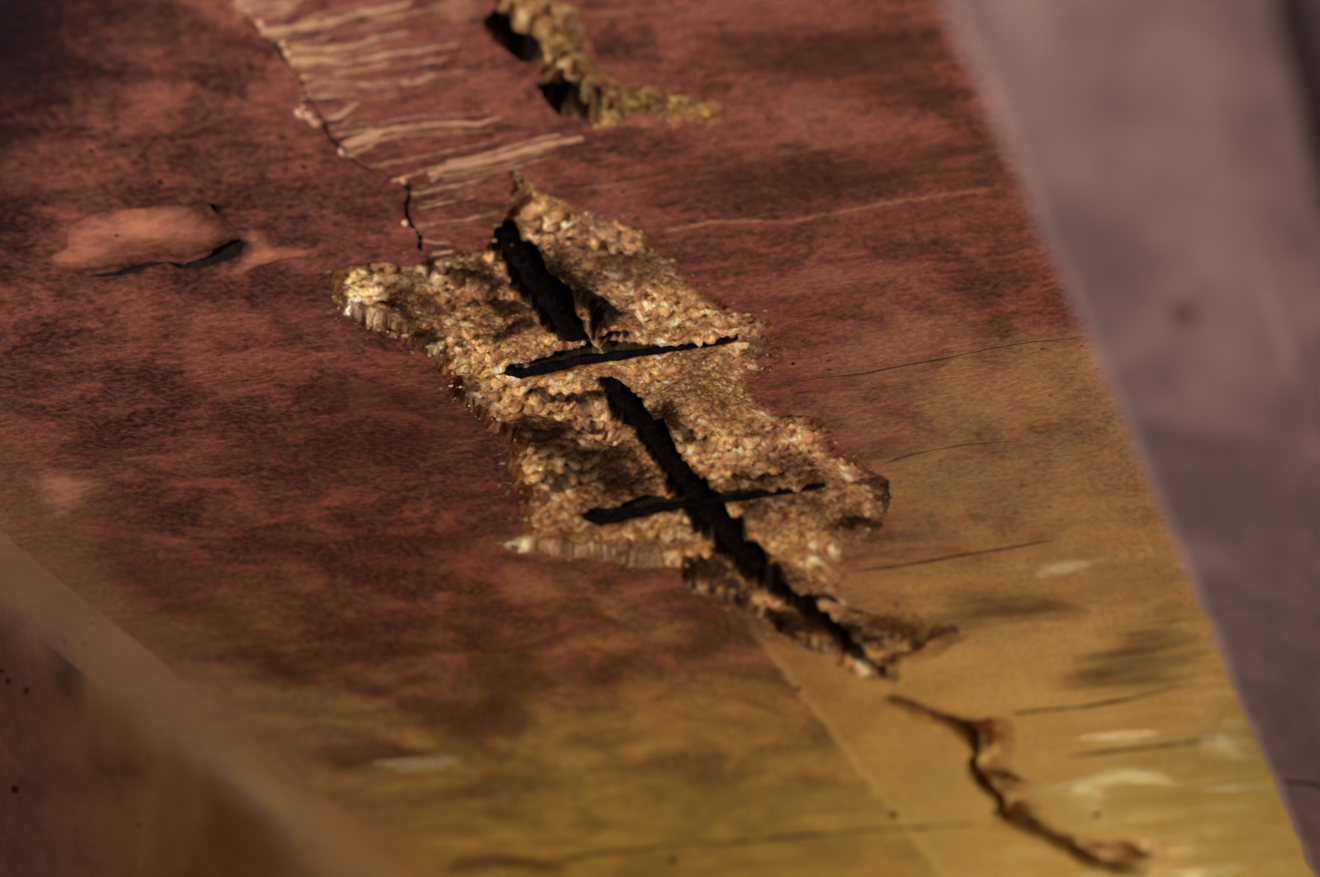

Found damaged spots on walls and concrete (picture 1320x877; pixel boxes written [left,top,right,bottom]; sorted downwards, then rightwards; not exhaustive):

spalling [482,0,729,133]
peeling [226,229,321,277]
crack [769,336,1087,387]
spalling [326,162,977,690]
crack [884,441,1014,464]
crack [852,539,1057,572]
crack [880,686,1181,877]